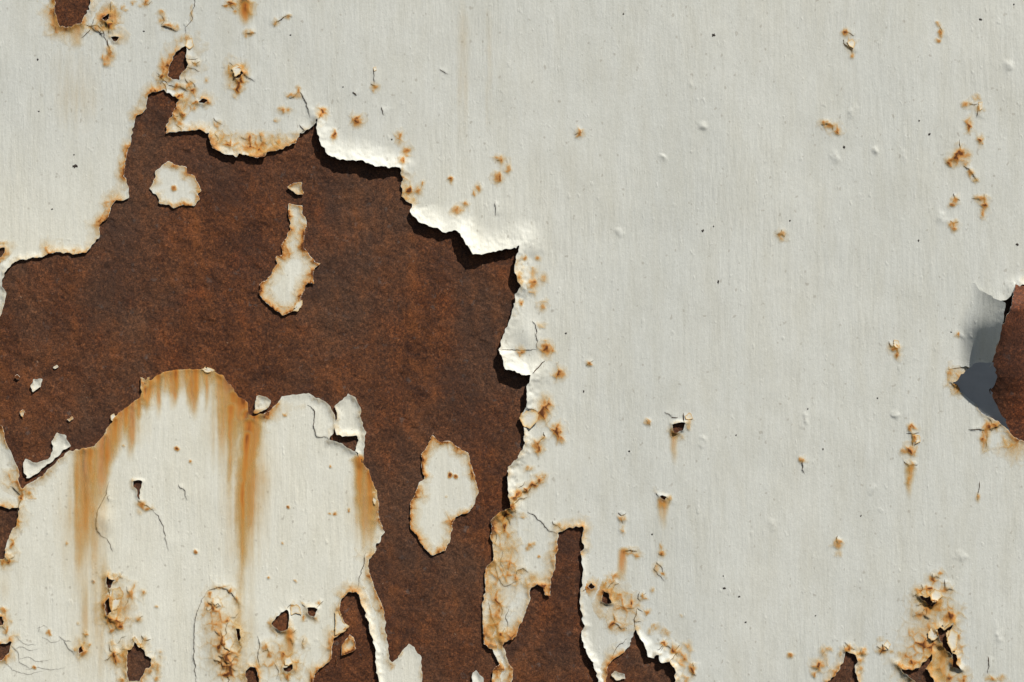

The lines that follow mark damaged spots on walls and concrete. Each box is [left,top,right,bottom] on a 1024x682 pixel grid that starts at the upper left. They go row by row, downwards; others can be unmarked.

peeling [48,0,113,40]
rust [214,119,281,154]
rust [946,97,983,167]
rust [495,156,511,182]
rust [972,196,988,216]
peeling [0,38,696,682]
rust [540,340,554,355]
peeling [947,277,1024,449]
rust [75,369,260,552]
rust [901,424,921,484]
rust [328,455,375,529]
rust [656,493,671,509]